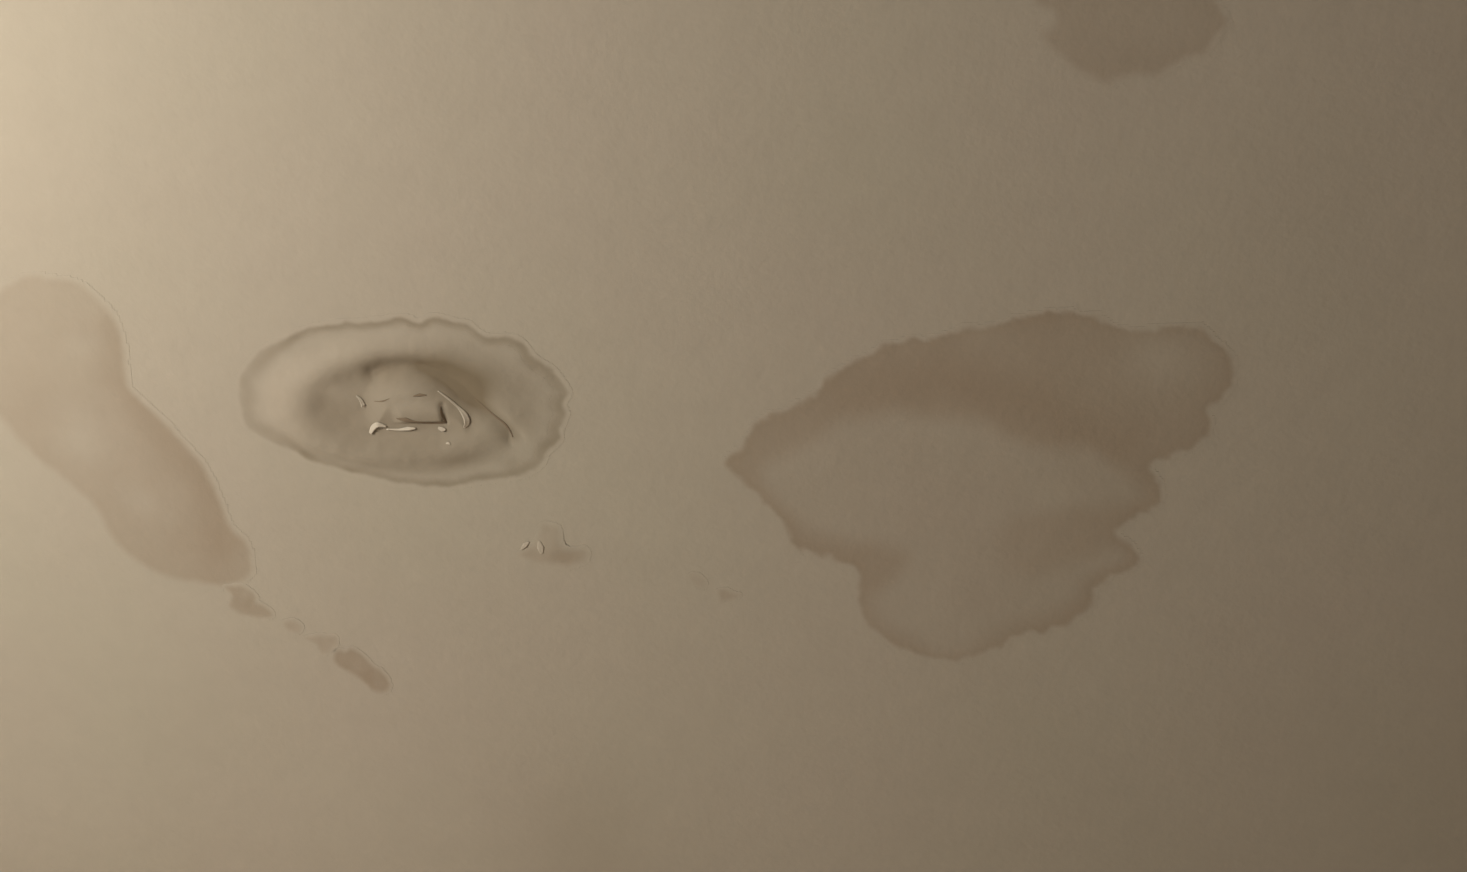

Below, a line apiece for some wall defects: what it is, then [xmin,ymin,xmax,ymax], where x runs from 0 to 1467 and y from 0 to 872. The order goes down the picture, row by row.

water stain [1030,0,1233,90]
water stain [0,272,393,695]
water stain [722,307,1239,665]